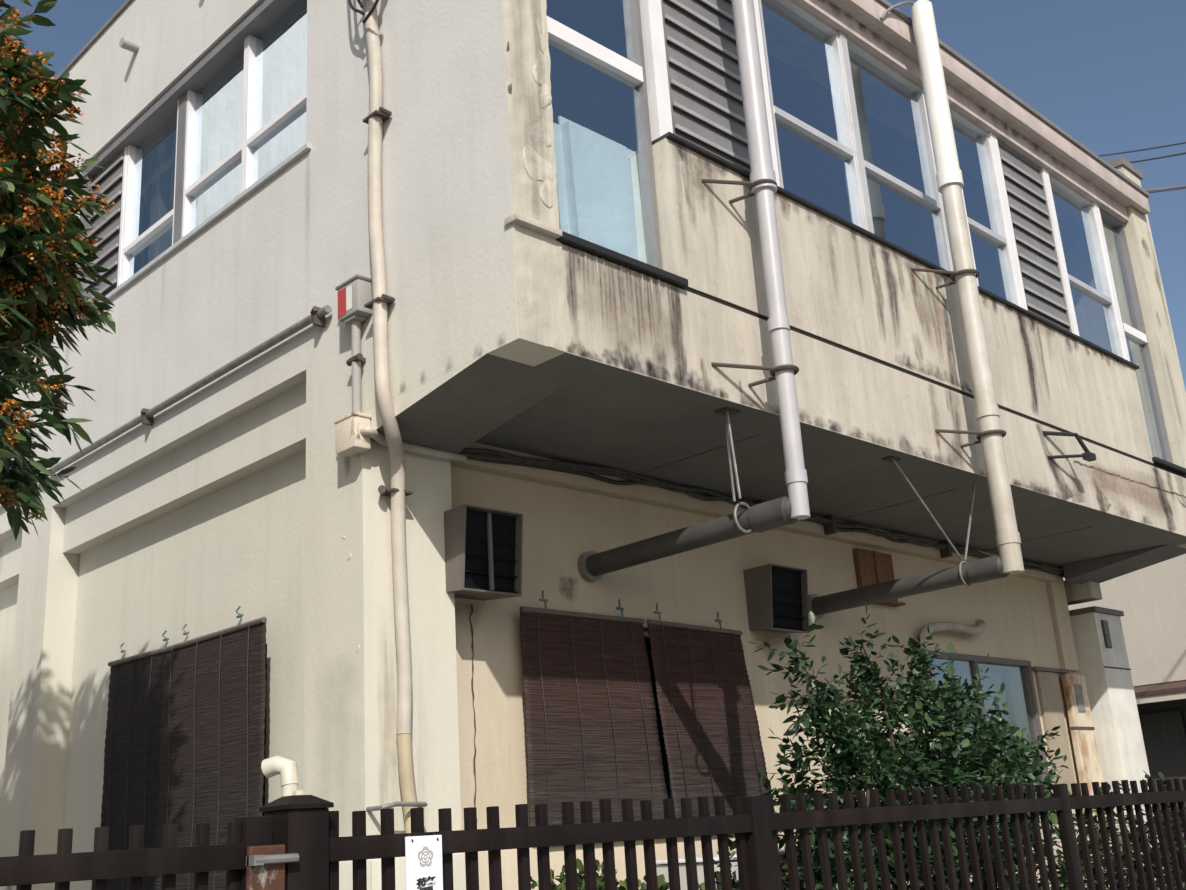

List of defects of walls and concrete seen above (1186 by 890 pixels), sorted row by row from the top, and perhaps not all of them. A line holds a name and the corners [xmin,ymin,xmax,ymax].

damp [872,251,897,311]
damp [569,250,683,380]
damp [984,295,1037,408]
damp [1051,459,1071,499]
damp [1154,467,1172,532]